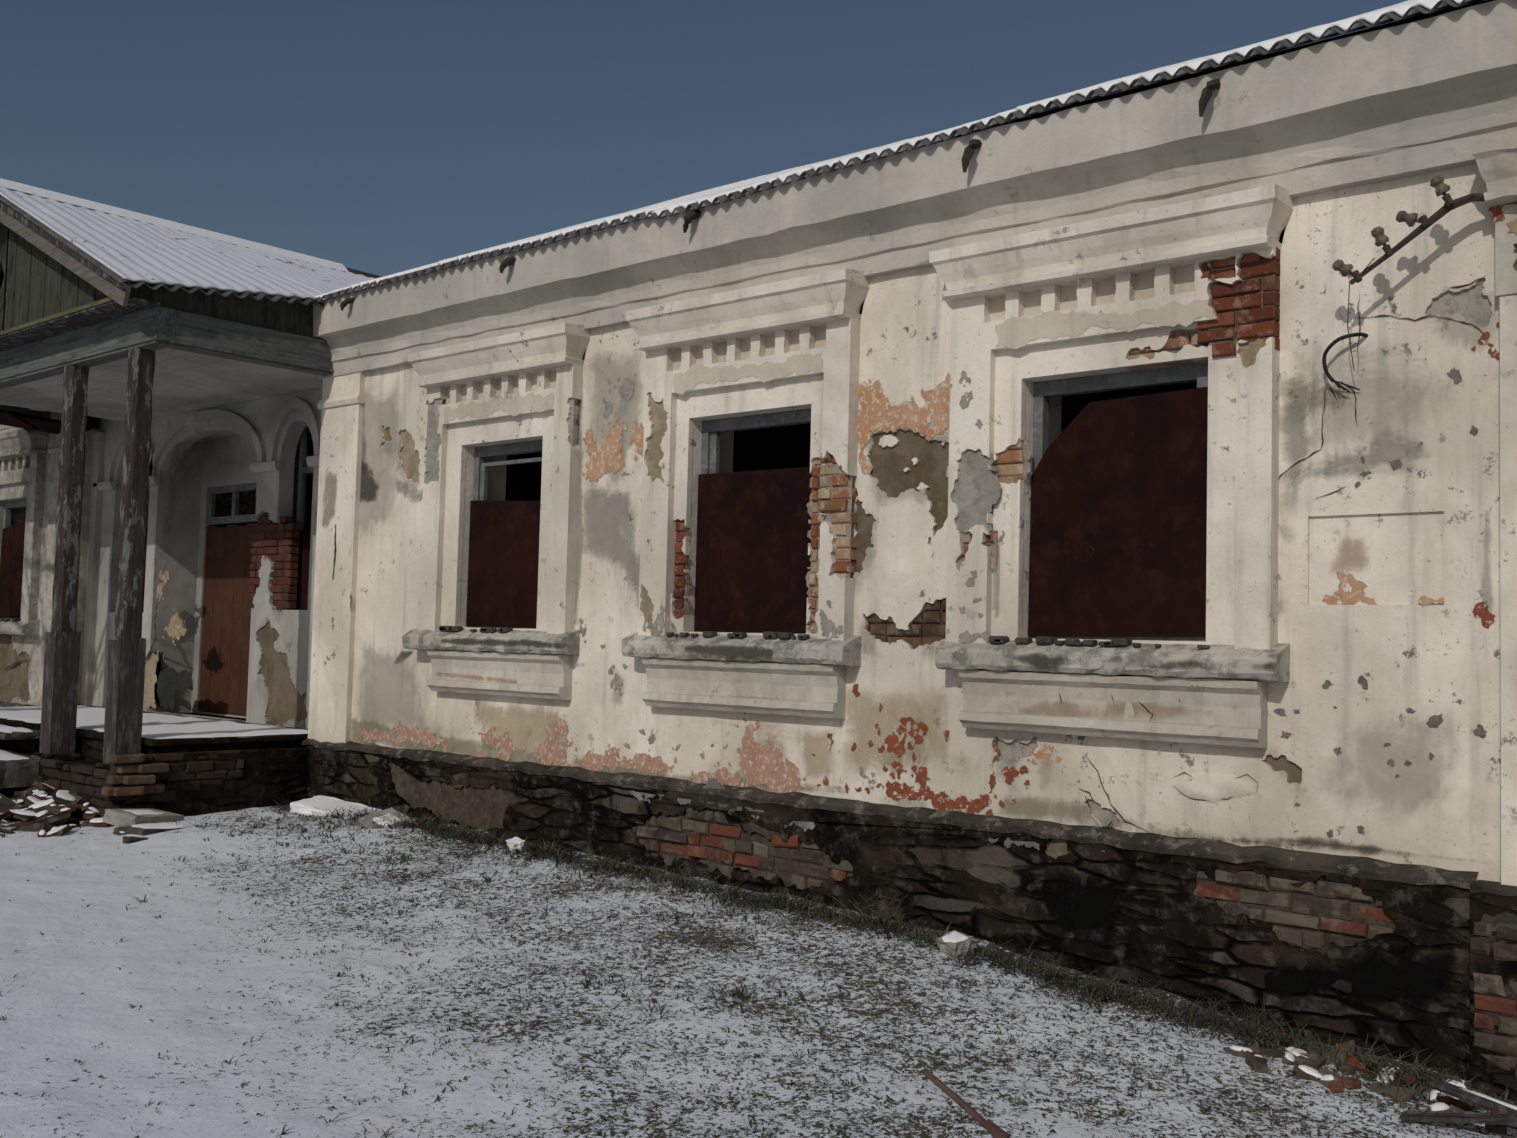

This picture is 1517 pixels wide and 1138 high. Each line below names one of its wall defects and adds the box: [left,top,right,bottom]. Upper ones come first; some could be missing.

peeling [1488,202,1517,235]
flaking render [1126,246,1280,371]
peeling [568,373,668,483]
flaking render [805,370,1031,649]
flaking render [0,634,30,703]
flaking render [249,512,307,726]
flaking render [359,721,516,830]
flaking render [640,520,692,637]
flaking render [534,703,1069,889]
flaking render [1262,708,1302,784]
peeling [1406,708,1443,728]
peeling [1474,724,1487,738]